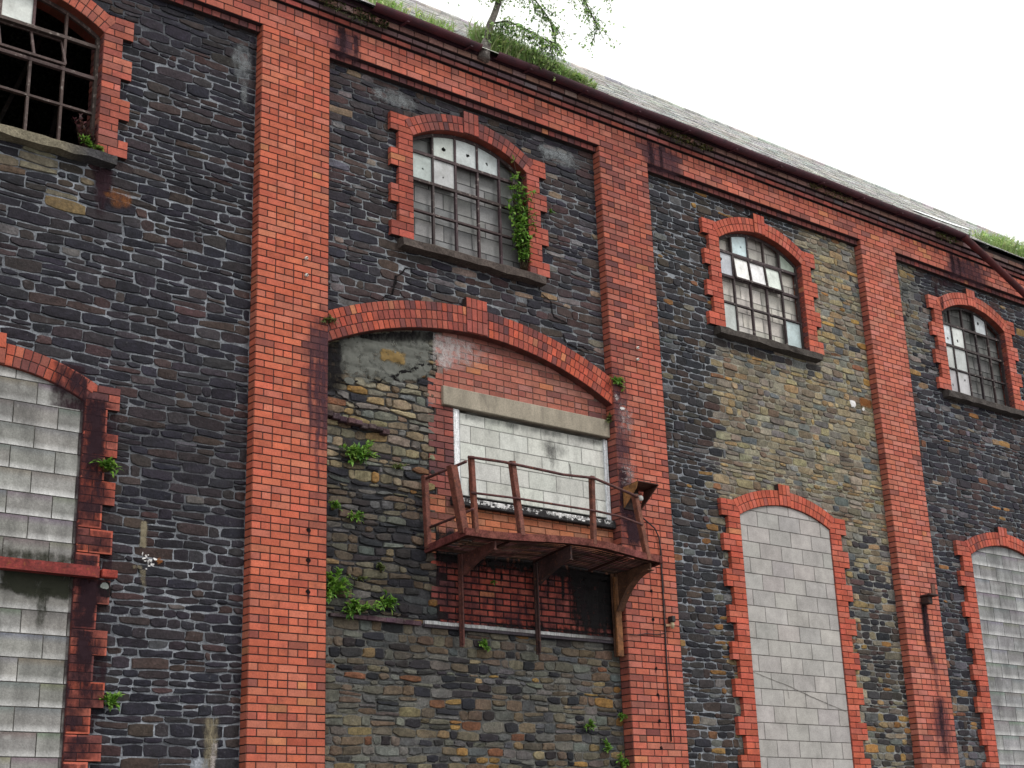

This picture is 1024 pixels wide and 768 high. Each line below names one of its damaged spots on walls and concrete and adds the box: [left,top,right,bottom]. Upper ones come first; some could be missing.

flaking render [328,331,433,392]
leakage [0,551,74,563]
leakage [1,570,99,671]